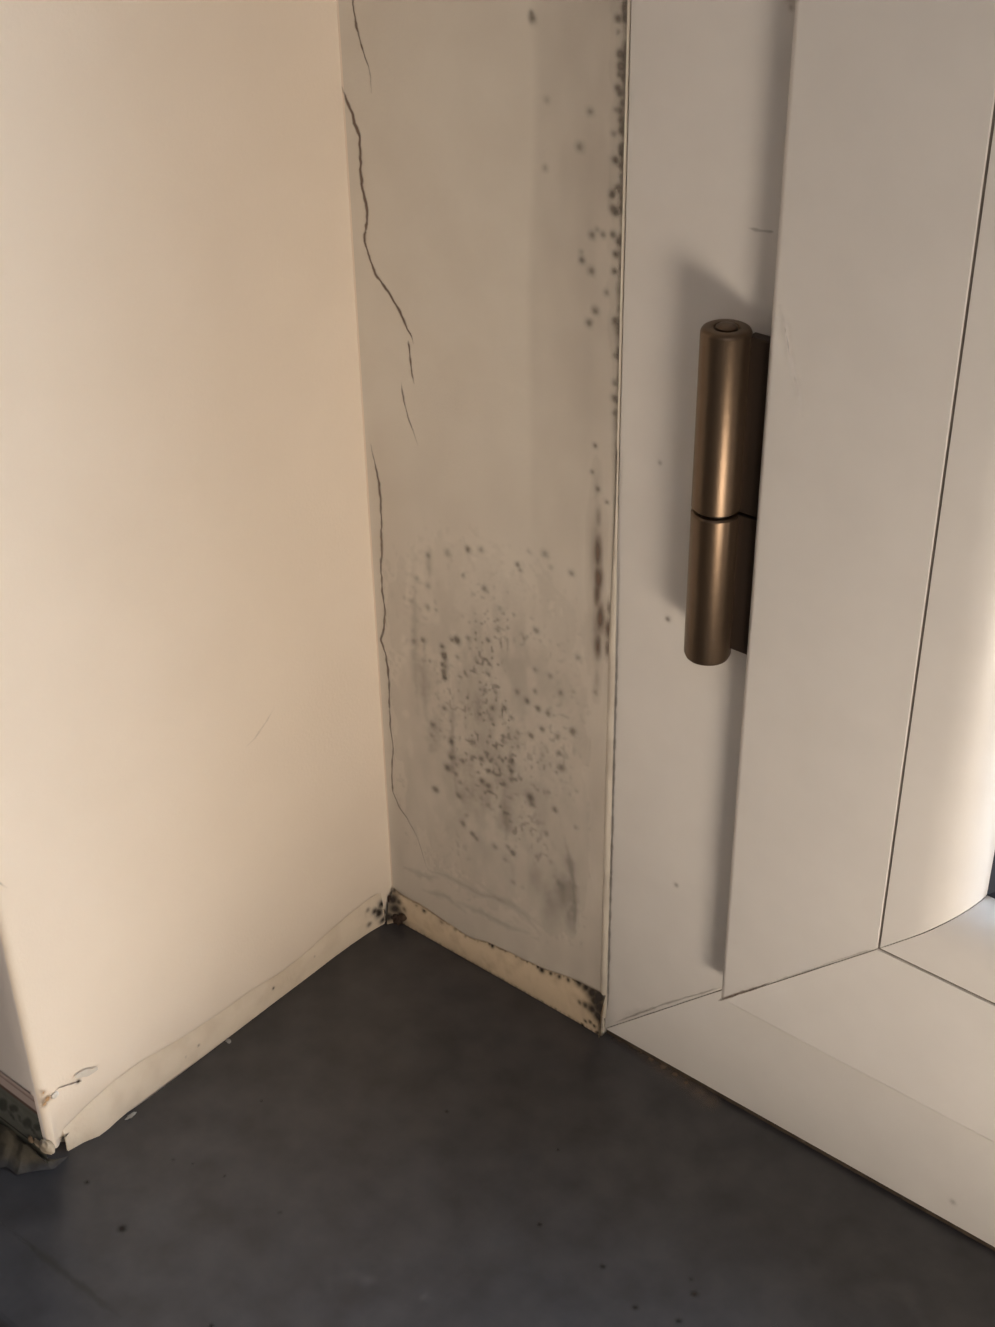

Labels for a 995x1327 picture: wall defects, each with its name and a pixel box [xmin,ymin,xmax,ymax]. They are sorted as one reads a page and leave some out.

crack [352,0,368,64]
mould [612,42,626,215]
crack [344,94,413,422]
crack [374,461,400,808]
leakage [595,540,610,655]